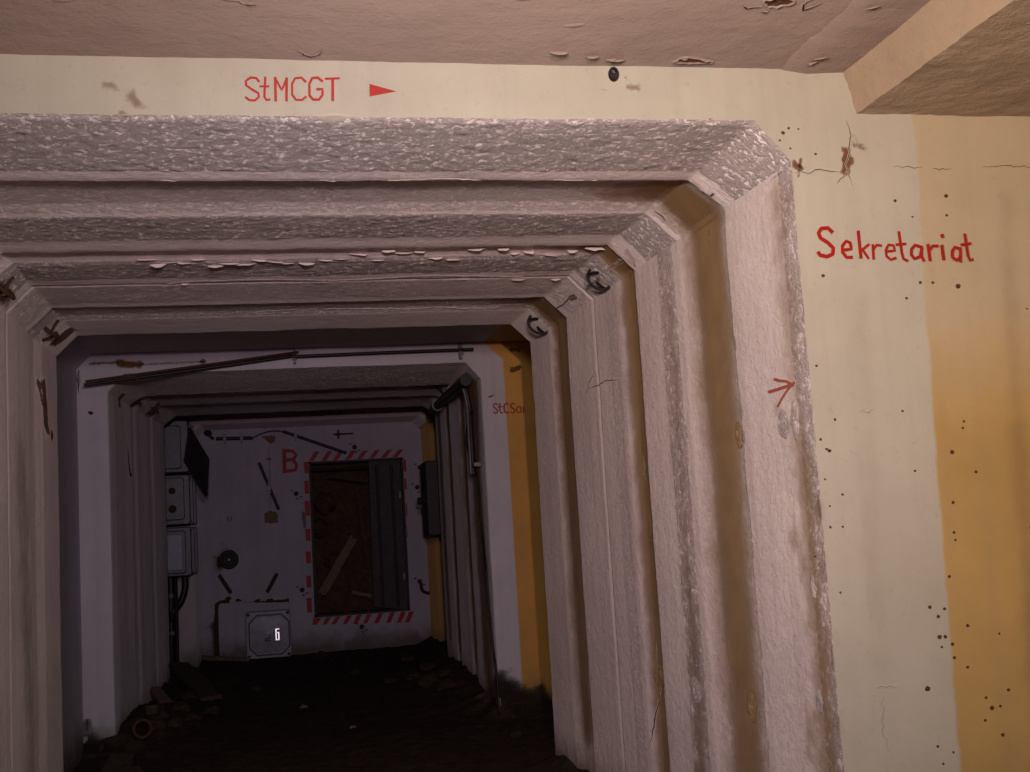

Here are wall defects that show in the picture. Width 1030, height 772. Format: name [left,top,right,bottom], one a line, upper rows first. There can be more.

spalling [742,0,796,14]
peeling [134,250,457,268]
peeling [468,247,605,257]